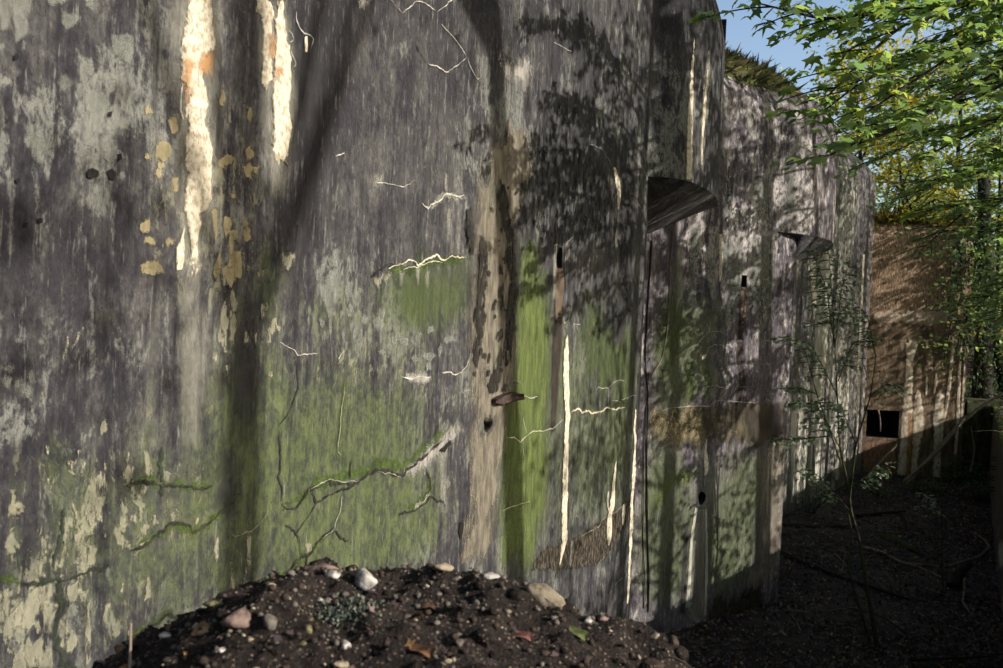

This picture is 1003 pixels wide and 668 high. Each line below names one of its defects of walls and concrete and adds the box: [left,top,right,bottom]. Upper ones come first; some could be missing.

crack [399,0,481,79]
crack [505,59,532,85]
crack [371,254,465,287]
rust [551,237,572,431]
crack [127,342,453,588]
leakage [404,427,460,476]
efflorescence [559,322,580,564]
crack [507,373,635,453]
leakage [606,410,637,604]
leakage [651,410,709,475]
crack [0,507,109,668]
leakage [680,508,764,621]